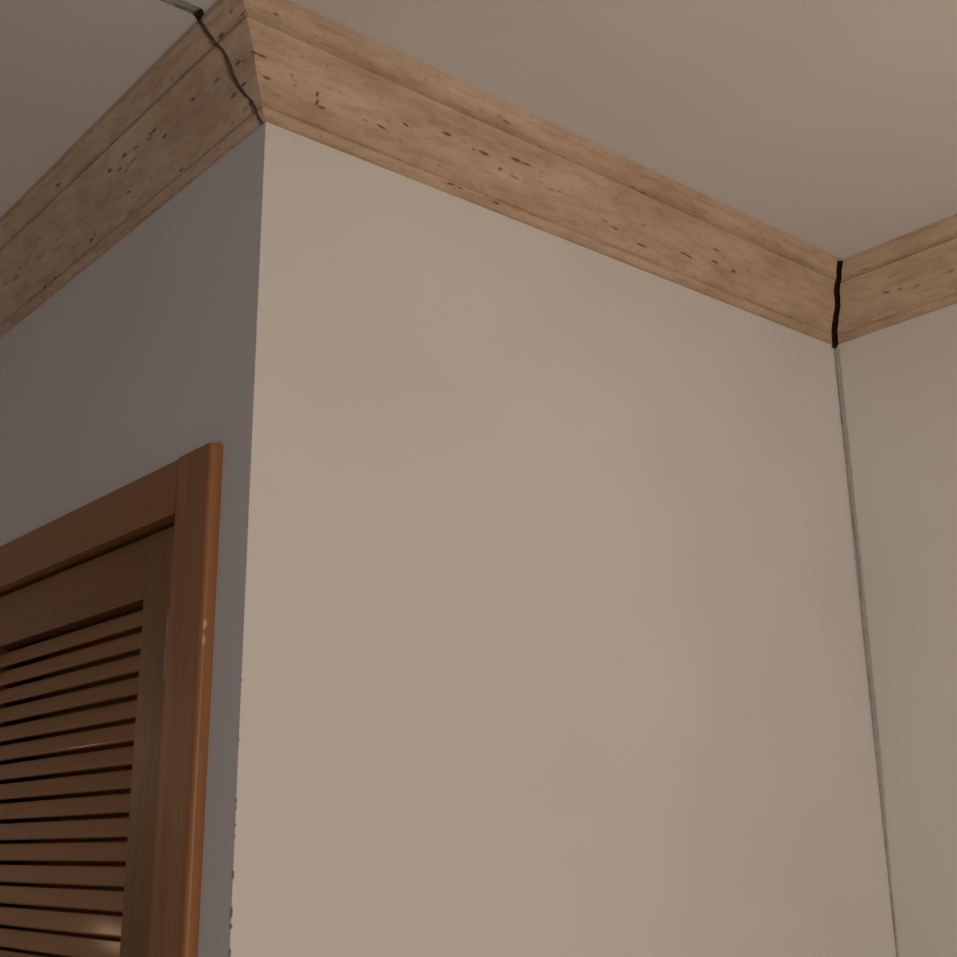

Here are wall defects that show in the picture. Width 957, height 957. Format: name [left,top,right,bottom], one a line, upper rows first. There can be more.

crack [160,0,264,126]
crack [831,260,890,873]